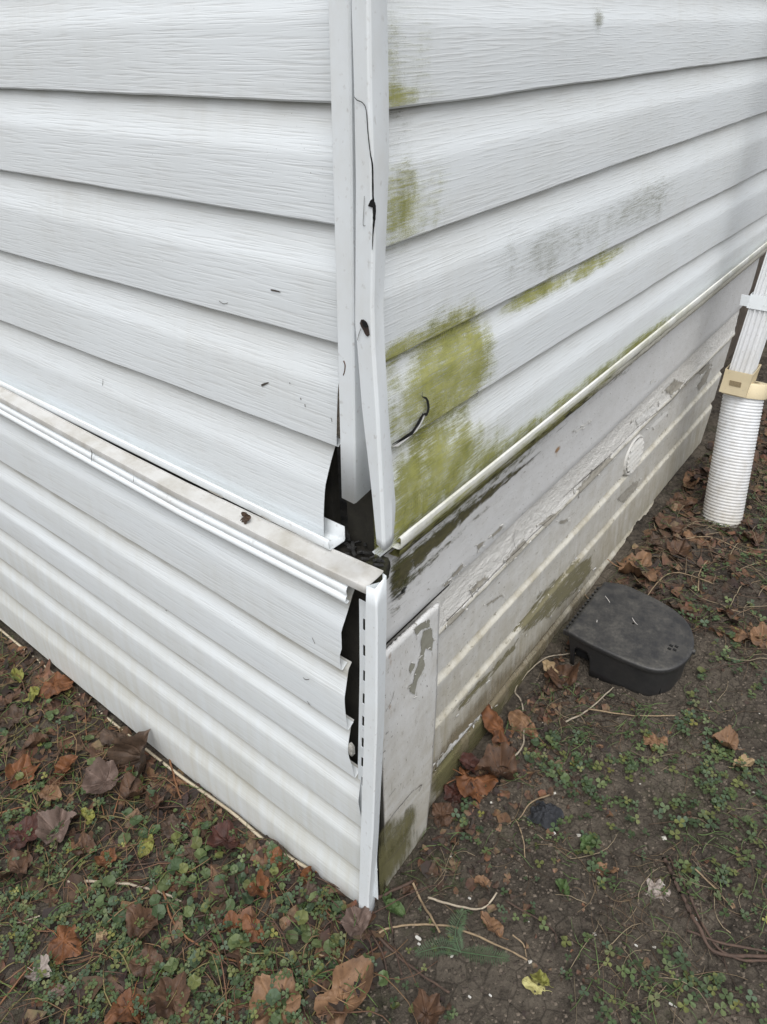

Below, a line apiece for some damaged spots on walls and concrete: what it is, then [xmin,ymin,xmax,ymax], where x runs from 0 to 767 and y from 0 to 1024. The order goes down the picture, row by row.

crack [354,97,376,249]
peeling [631,360,713,430]
peeling [574,452,616,497]
peeling [618,478,642,505]
peeling [536,512,571,528]
peeling [503,539,532,566]
peeling [445,575,491,630]
peeling [408,619,436,698]